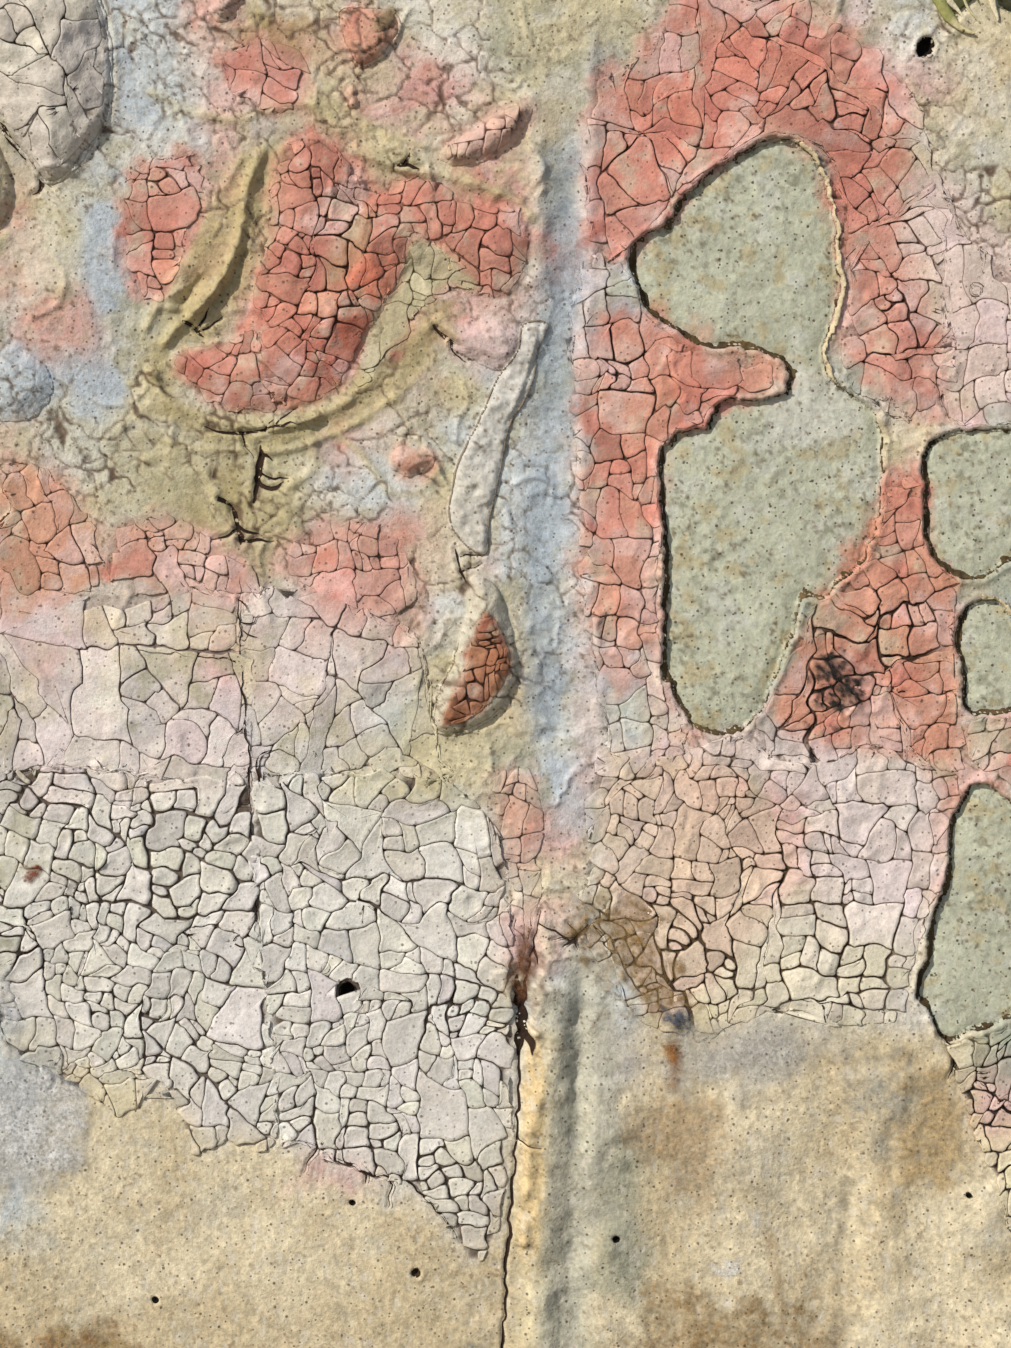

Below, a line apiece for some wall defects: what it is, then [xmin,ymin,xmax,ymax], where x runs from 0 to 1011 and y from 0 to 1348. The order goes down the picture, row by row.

crack [0,64,77,195]
crack [121,154,204,302]
crack [174,138,529,503]
peeling [0,486,11,522]
peeling [628,137,885,735]
crack [529,0,1011,1043]
peeling [921,428,1011,579]
peeling [955,595,1011,716]
crack [0,463,544,1348]
corrosion [507,932,542,996]
peeling [916,784,1011,1042]
damp [38,1327,125,1348]